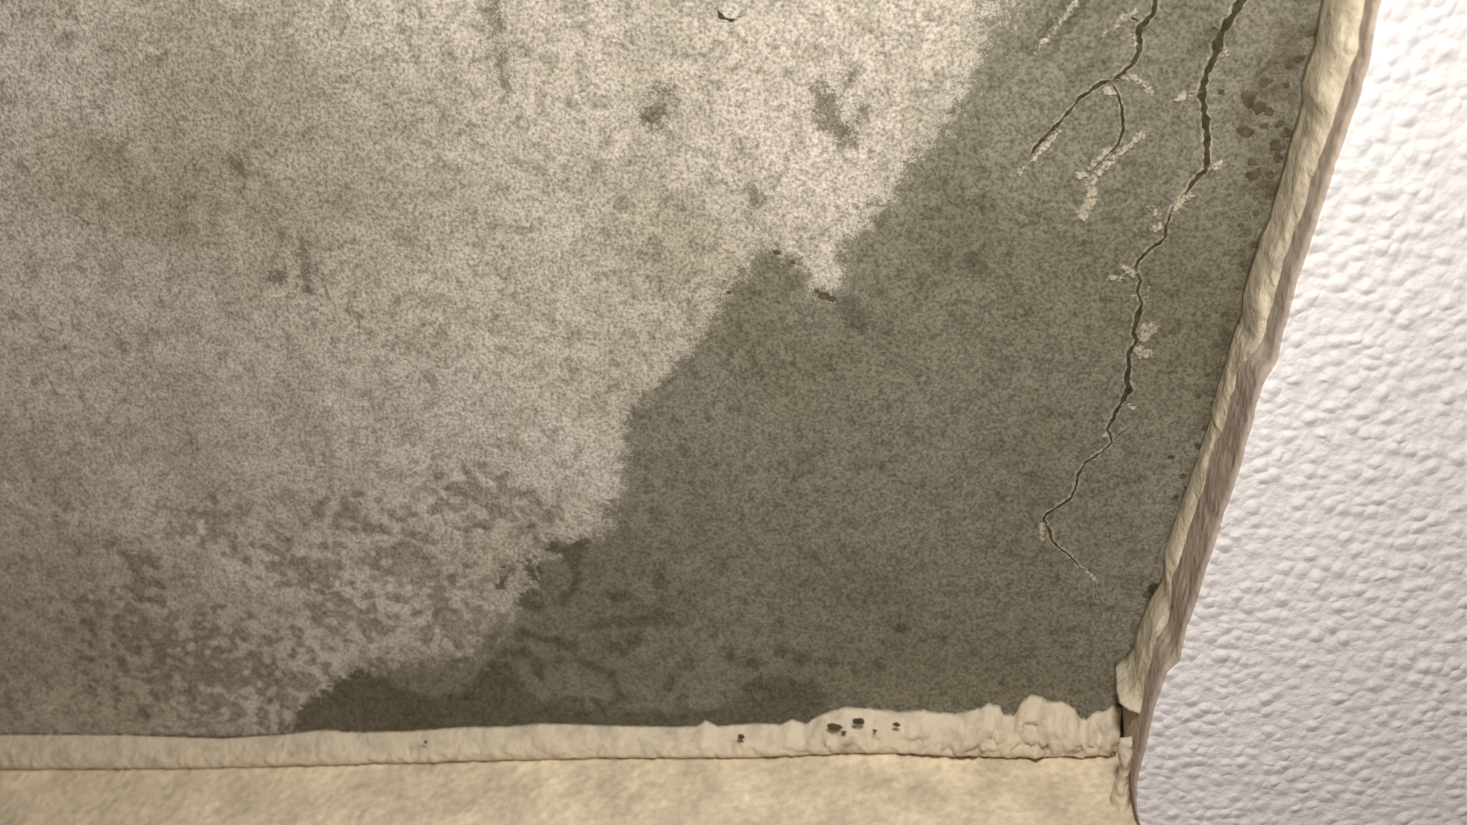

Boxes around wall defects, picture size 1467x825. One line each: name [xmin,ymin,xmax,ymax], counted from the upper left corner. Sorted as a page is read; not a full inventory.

leakage [60,0,1321,745]
peeling [716,1,747,25]
spalling [814,289,836,302]
crack [1017,0,1250,664]
spalling [1160,0,1320,551]